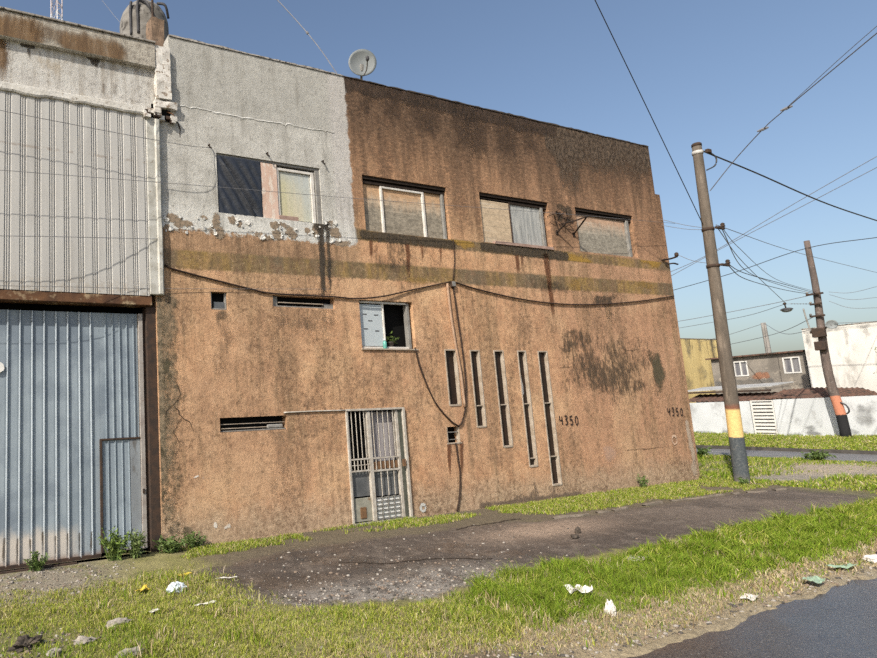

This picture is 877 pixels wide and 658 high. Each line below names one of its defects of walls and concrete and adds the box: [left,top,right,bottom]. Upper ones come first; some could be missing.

corrosion [0,15,125,70]
leakage [344,78,651,190]
peeling [162,213,351,247]
leakage [562,329,665,404]
crack [165,381,192,458]